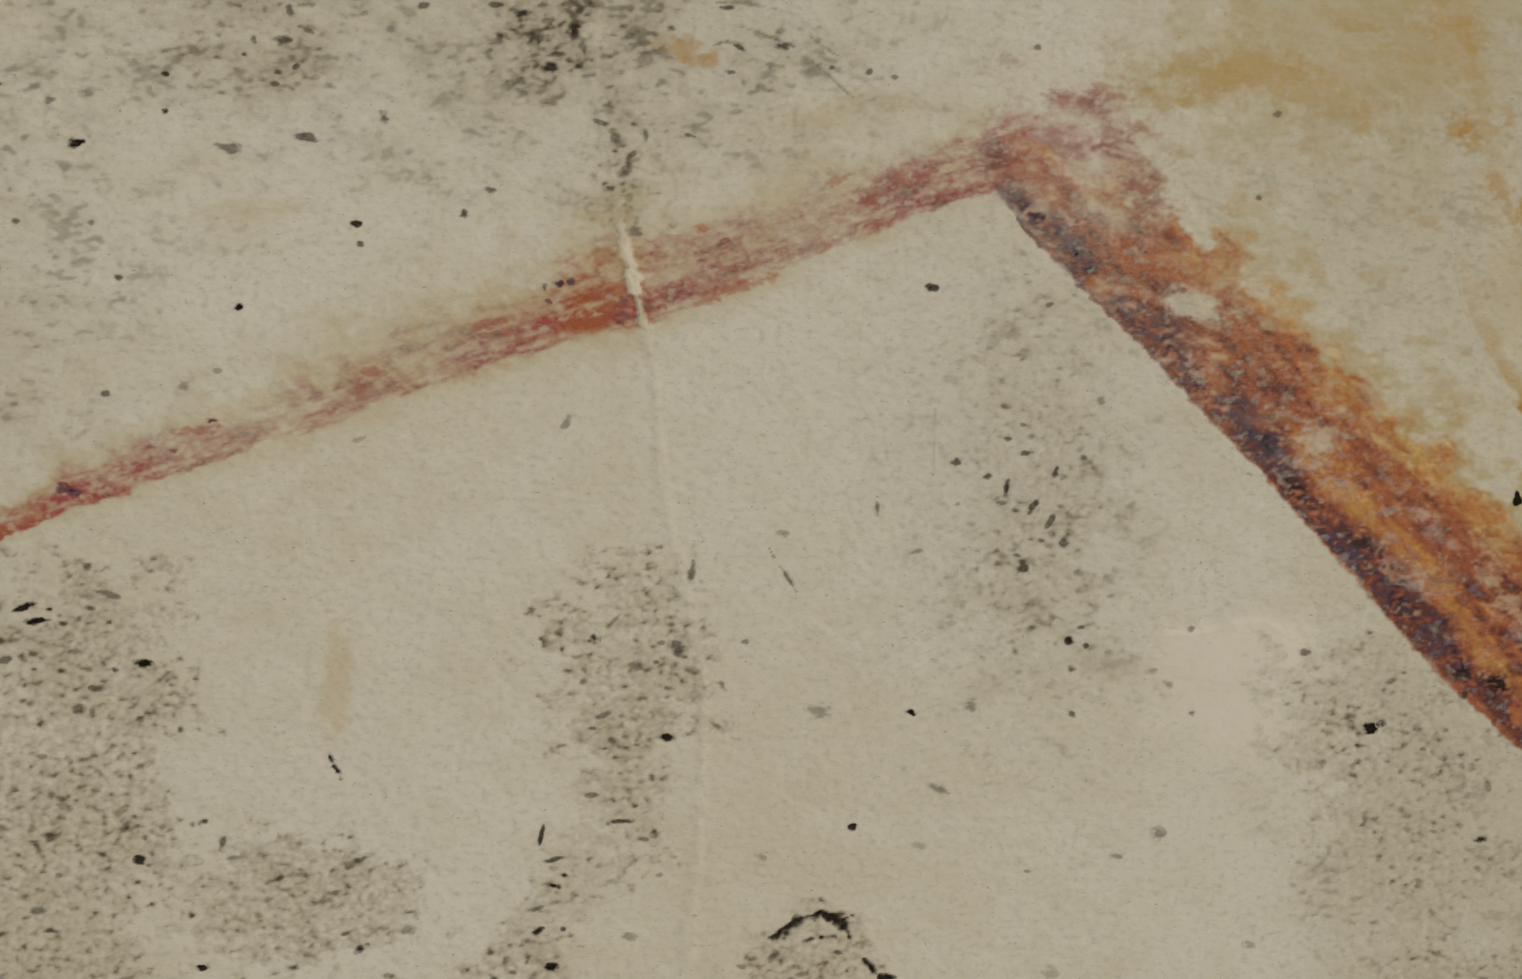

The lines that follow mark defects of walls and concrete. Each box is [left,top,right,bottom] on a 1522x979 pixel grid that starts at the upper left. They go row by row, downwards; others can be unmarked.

damp [623,222,645,238]
damp [456,0,900,203]
damp [980,0,1522,285]
rust [0,0,1522,753]
damp [0,507,765,979]
damp [734,888,900,979]